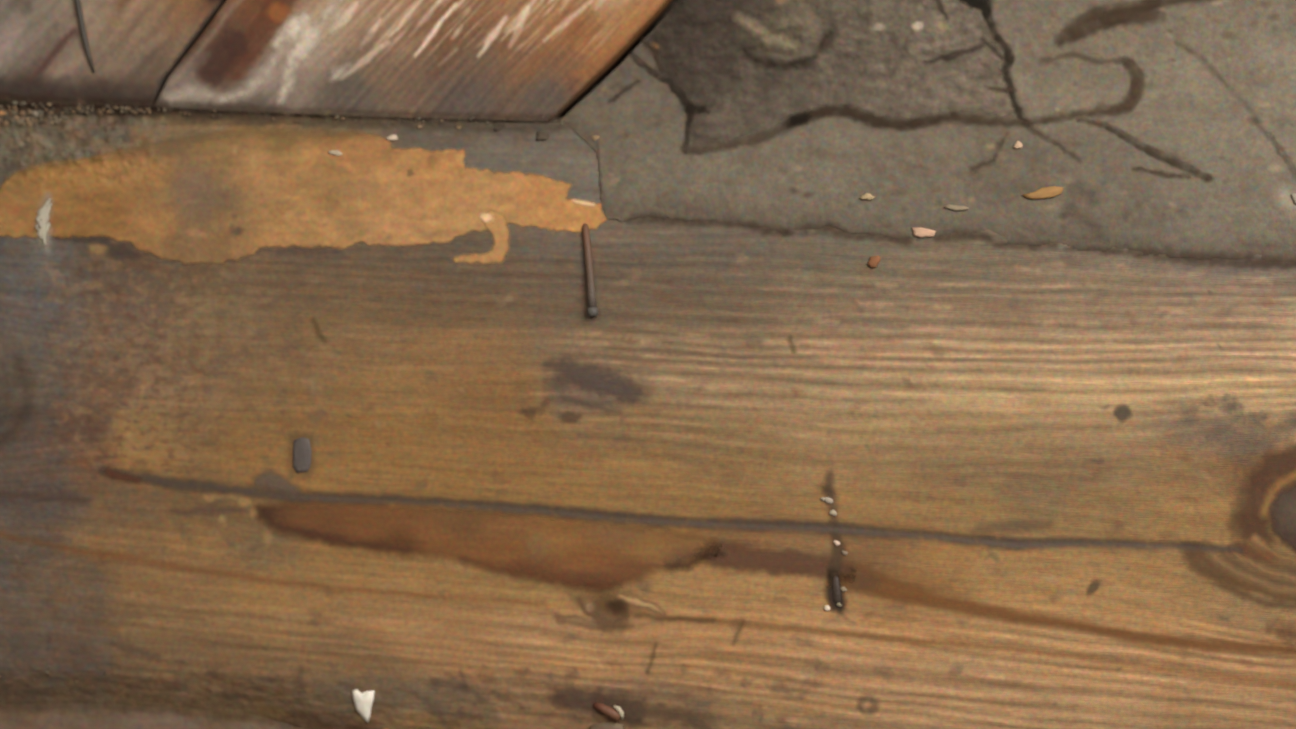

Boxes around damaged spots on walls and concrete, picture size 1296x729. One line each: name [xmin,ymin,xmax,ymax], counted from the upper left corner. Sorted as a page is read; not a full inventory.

crack [610,0,1212,180]
peeling [0,130,607,264]
damp [557,362,639,401]
crack [103,469,1242,551]
damp [258,502,1296,653]